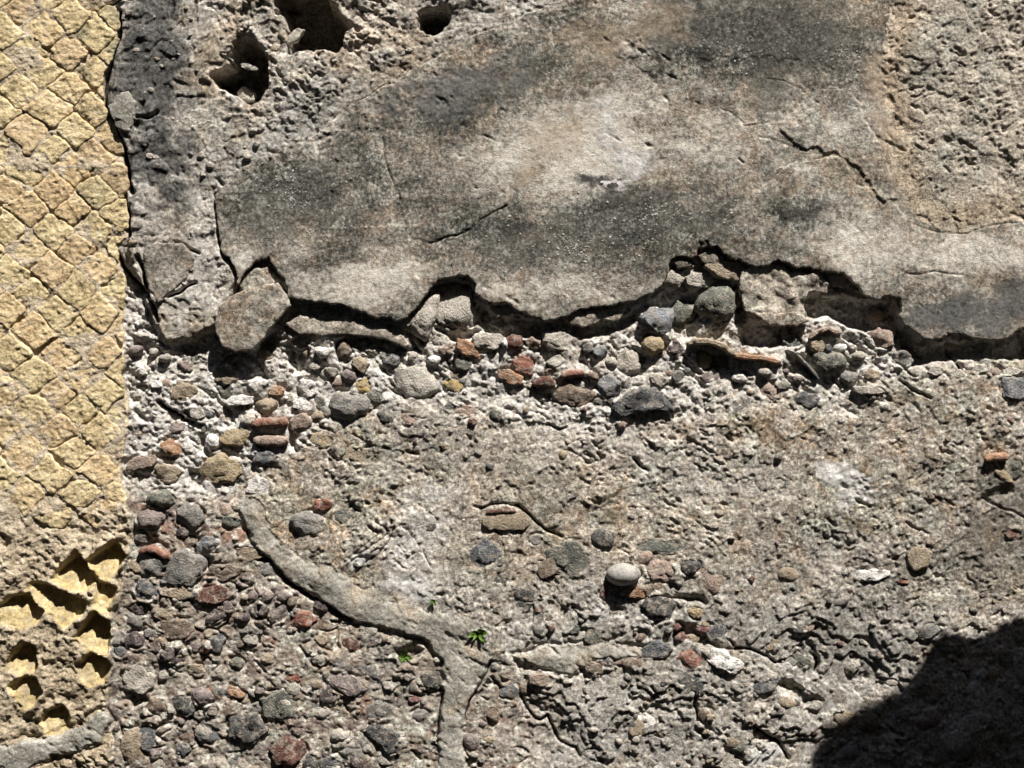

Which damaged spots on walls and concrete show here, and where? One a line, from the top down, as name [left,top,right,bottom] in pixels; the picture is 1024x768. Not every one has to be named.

crack [190,230,243,292]
spalling [182,228,1024,499]
peeling [591,527,622,550]
peeling [906,546,933,572]
spalling [0,540,143,736]
peeling [149,635,202,681]
peeling [153,707,212,749]
peeling [268,666,336,719]
peeling [494,570,561,643]
peeling [567,598,608,645]
peeling [660,672,790,768]
peeling [719,639,884,712]